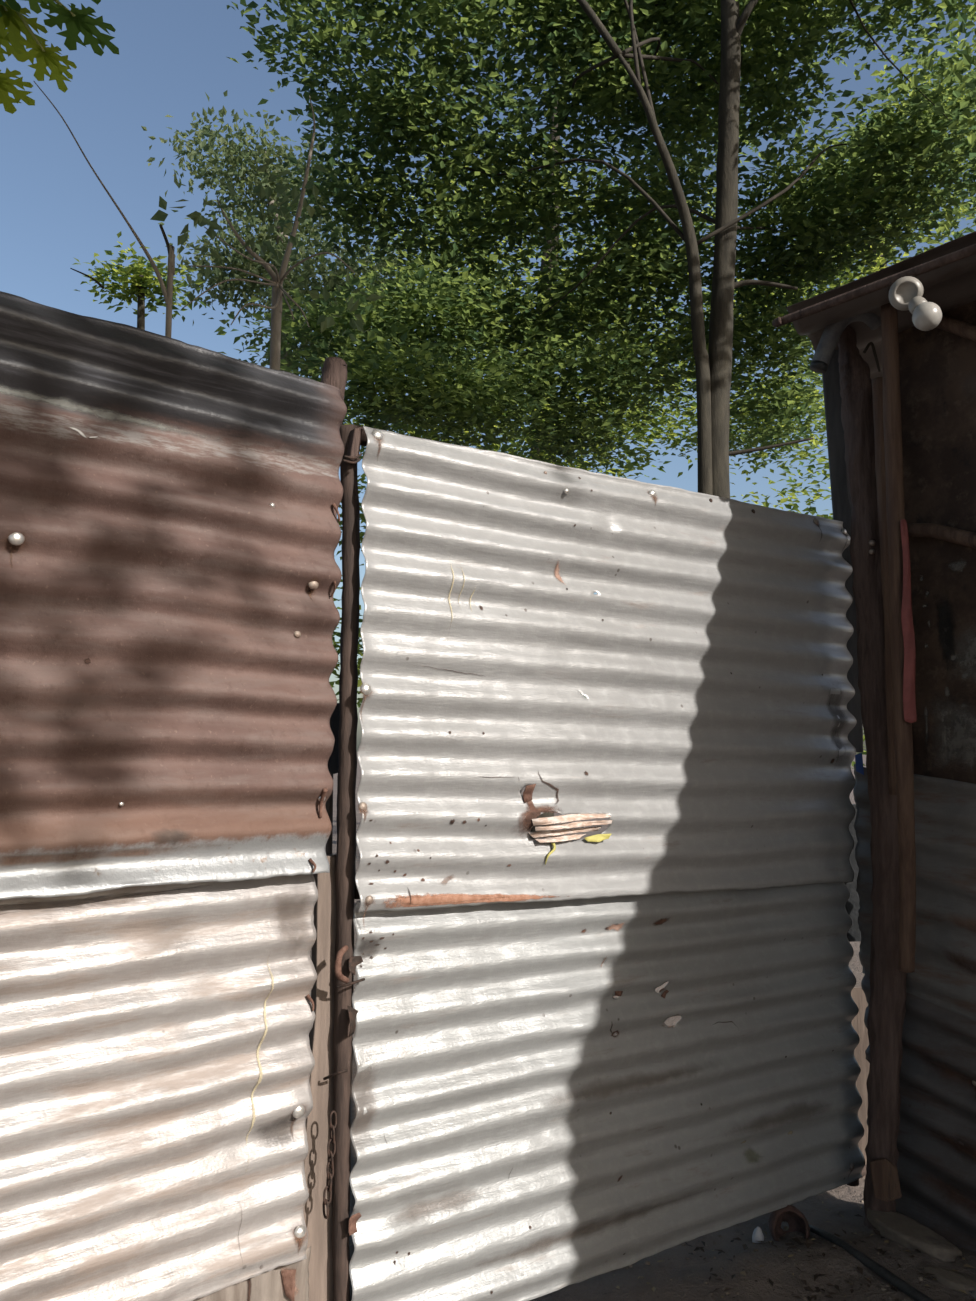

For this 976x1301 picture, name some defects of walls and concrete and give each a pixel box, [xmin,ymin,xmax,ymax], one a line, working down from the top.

peeling [523,784,536,803]
corrosion [3,852,99,864]
corrosion [368,854,556,908]
corrosion [349,909,394,975]